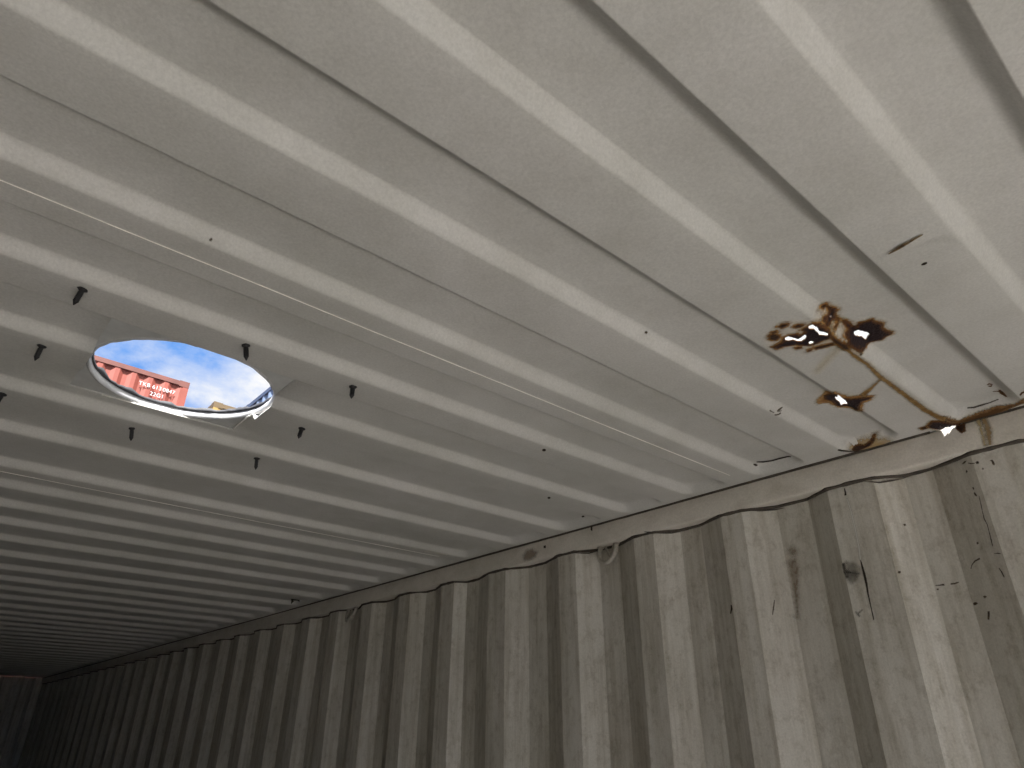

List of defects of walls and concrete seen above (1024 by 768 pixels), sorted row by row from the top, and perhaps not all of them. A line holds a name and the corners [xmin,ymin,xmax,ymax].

rust [767,302,1024,445]
crack [844,488,874,620]